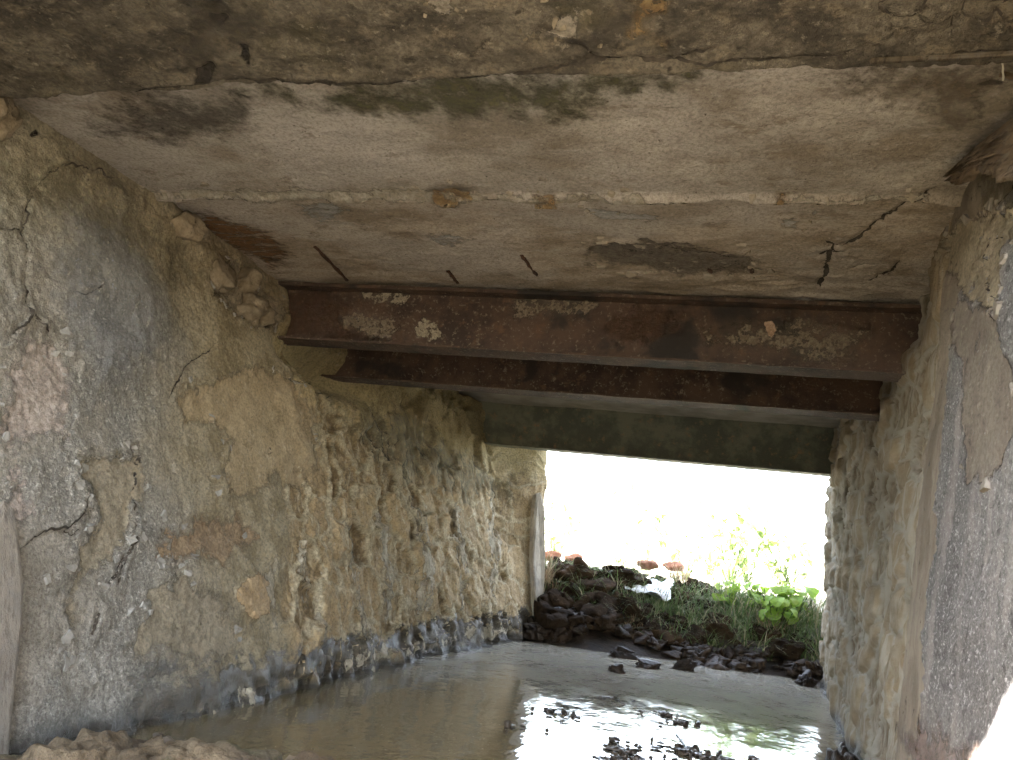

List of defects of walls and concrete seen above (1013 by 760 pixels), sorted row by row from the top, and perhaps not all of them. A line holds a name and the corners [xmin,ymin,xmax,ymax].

crack [453,0,1013,79]
crack [135,78,417,92]
damp [104,95,248,143]
spalling [142,182,686,205]
spalling [580,236,775,281]
crack [817,186,937,286]
damp [127,496,530,735]